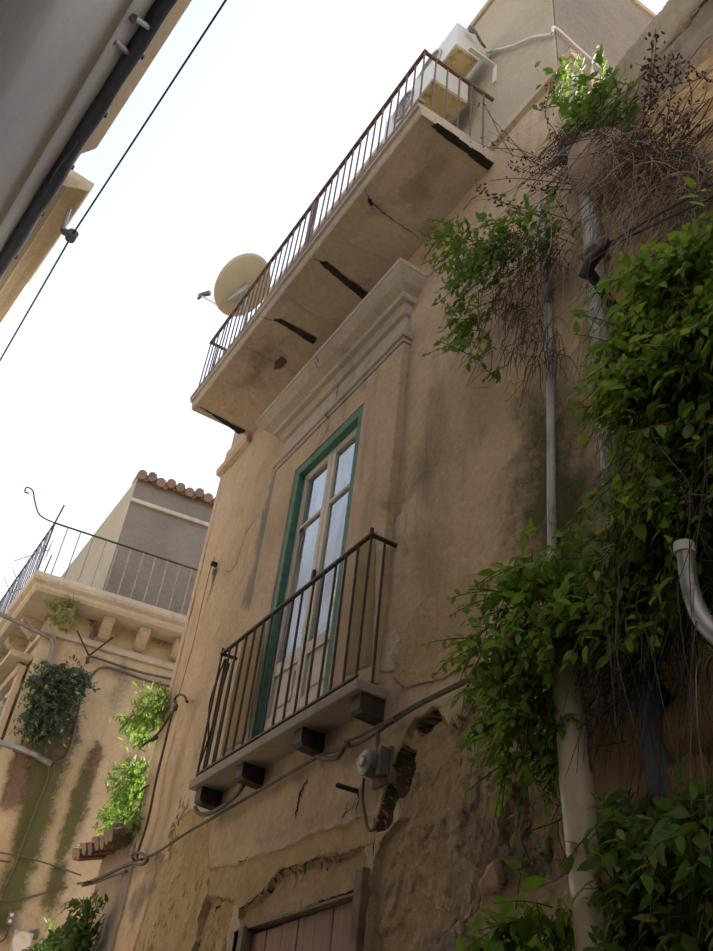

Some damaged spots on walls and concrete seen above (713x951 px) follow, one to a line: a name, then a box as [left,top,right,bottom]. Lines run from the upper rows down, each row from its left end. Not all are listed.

crack [364,189,438,259]
crack [295,776,308,818]
spalling [133,685,568,951]